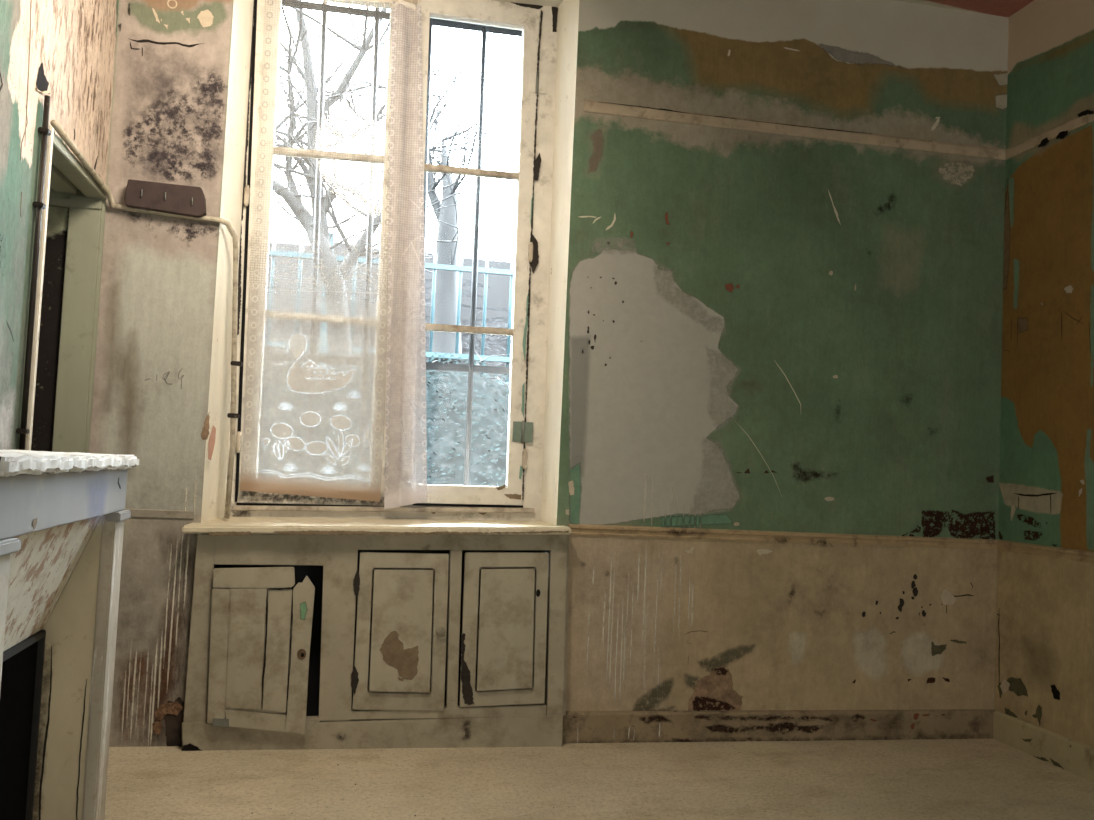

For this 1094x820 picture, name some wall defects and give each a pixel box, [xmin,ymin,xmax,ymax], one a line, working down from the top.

peeling [167,0,214,28]
peeling [820,44,894,66]
crack [0,0,32,161]
spalling [35,63,50,94]
peeling [994,73,1008,109]
water stain [127,76,225,180]
spalling [1038,130,1068,147]
peeling [902,510,1003,540]
peeling [890,574,957,634]
peeling [380,631,419,681]
peeling [931,640,966,656]
spalling [686,666,833,734]